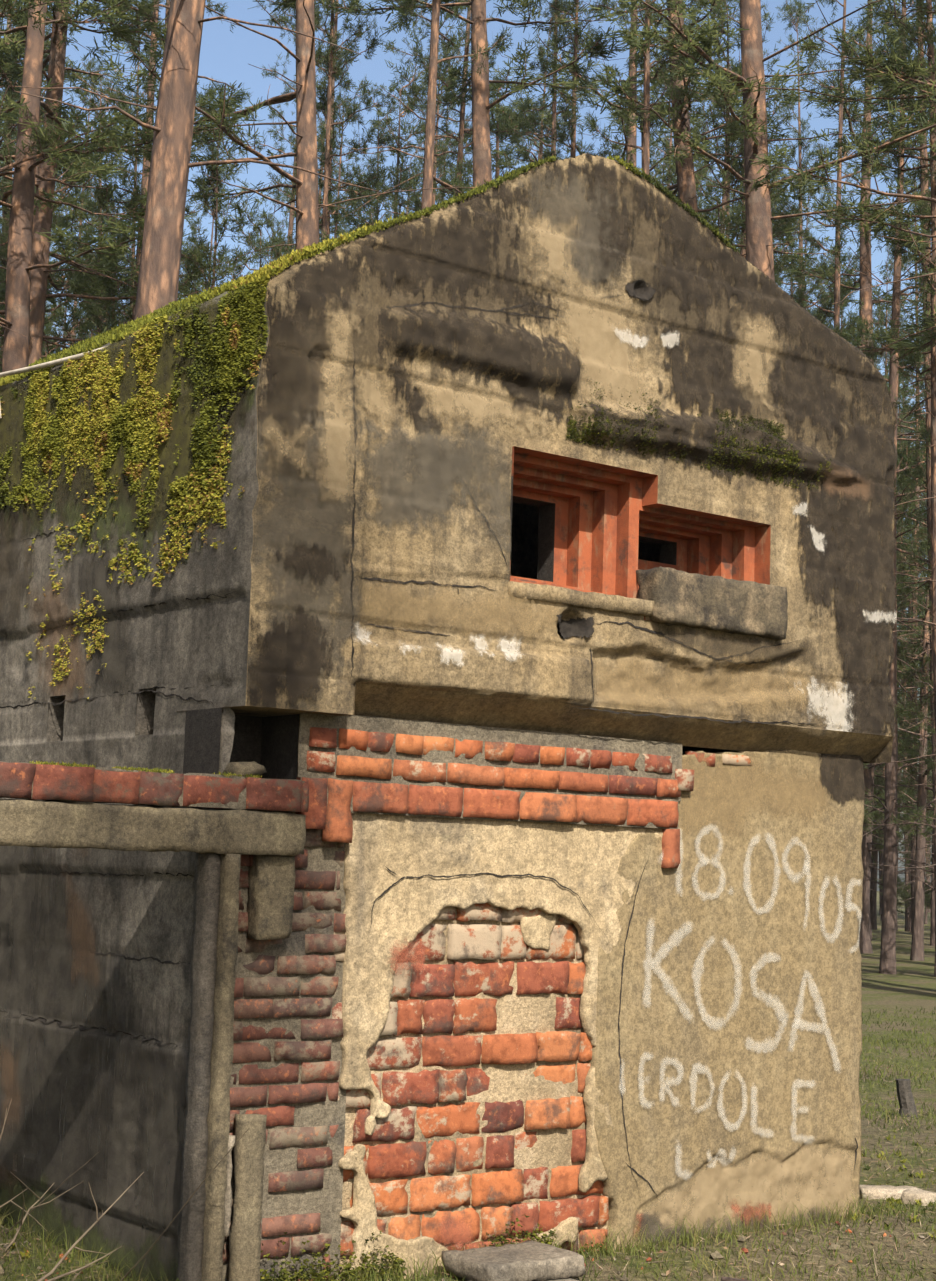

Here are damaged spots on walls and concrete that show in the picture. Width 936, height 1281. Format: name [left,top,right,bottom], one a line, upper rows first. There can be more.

damp [0,153,898,736]
crack [0,684,229,709]
crack [574,621,821,725]
crack [87,950,190,965]
peeling [520,914,556,950]
crack [0,1010,189,1048]
crack [368,858,659,1200]
peeling [647,1145,853,1235]